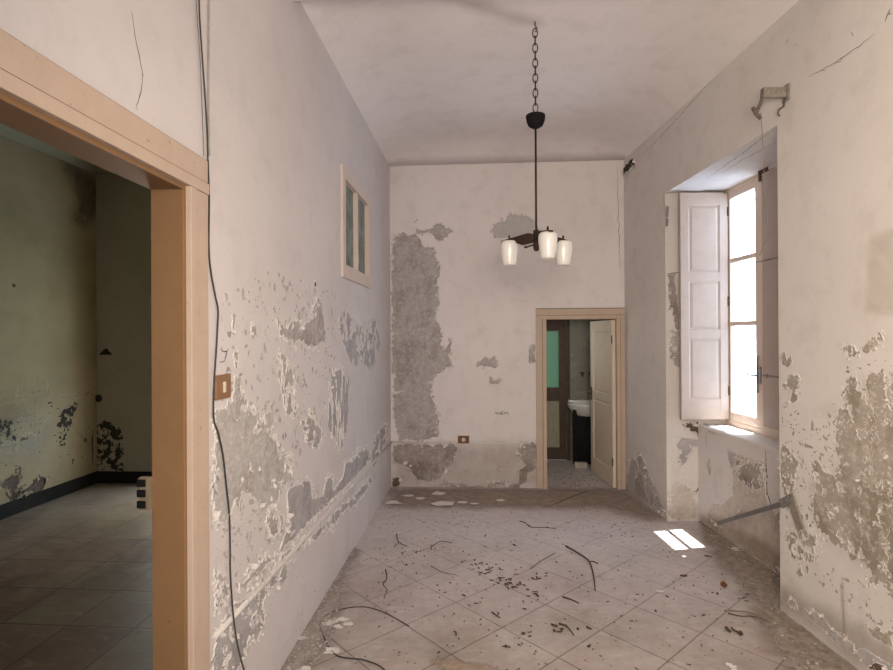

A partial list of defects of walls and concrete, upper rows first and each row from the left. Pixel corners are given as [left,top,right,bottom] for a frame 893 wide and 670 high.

crack [809,32,869,77]
peeling [209,222,537,670]
peeling [627,329,893,650]